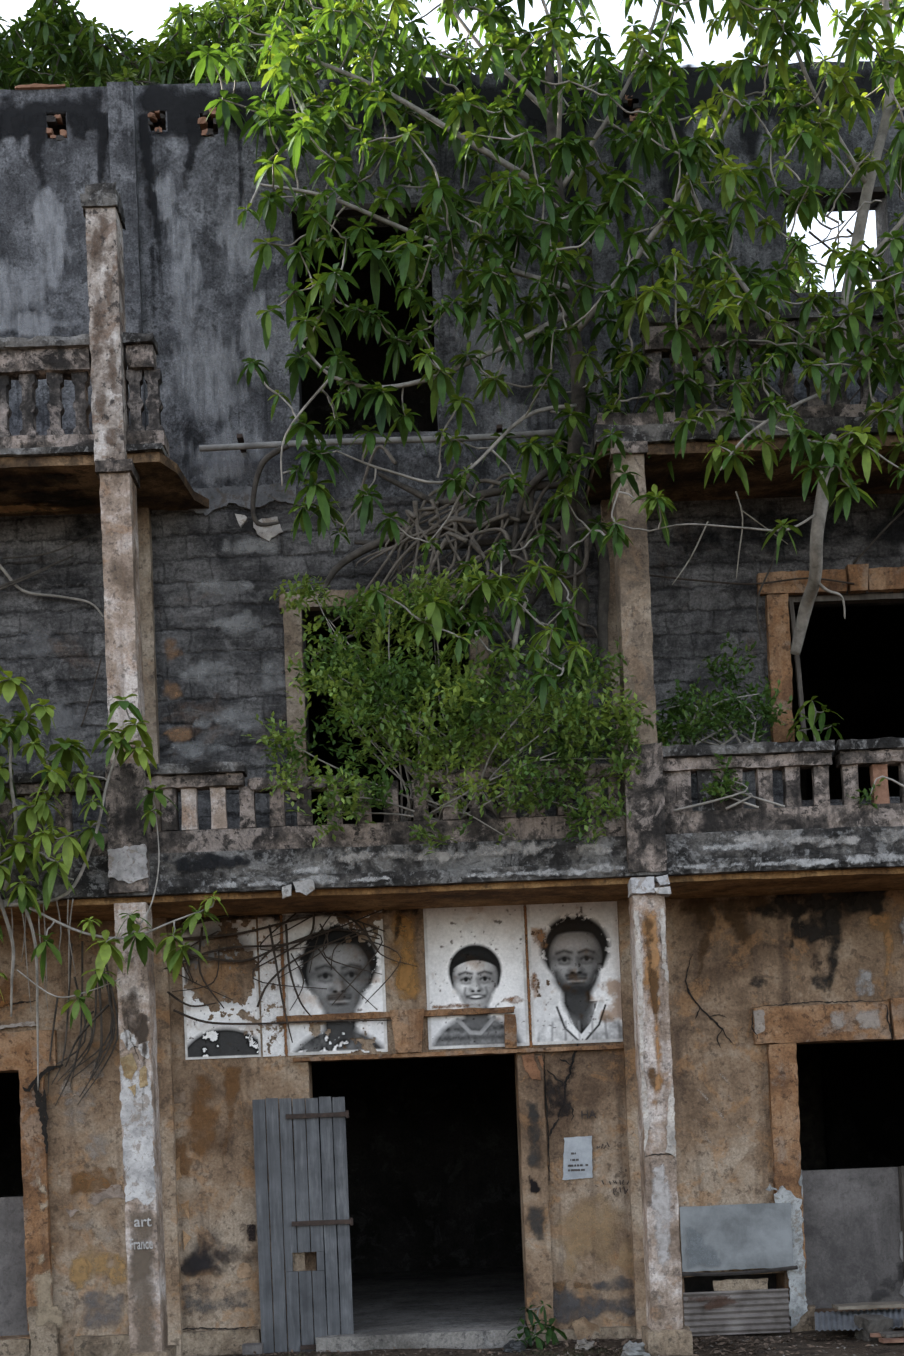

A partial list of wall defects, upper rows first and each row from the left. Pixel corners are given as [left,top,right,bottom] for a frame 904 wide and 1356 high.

water stain [0,91,108,184]
peeling [156,177,198,316]
flaking render [182,295,297,541]
peeling [653,875,671,983]
crack [685,954,893,1048]
water stain [755,890,886,990]
peeling [64,1030,156,1218]
peeling [633,911,676,1264]